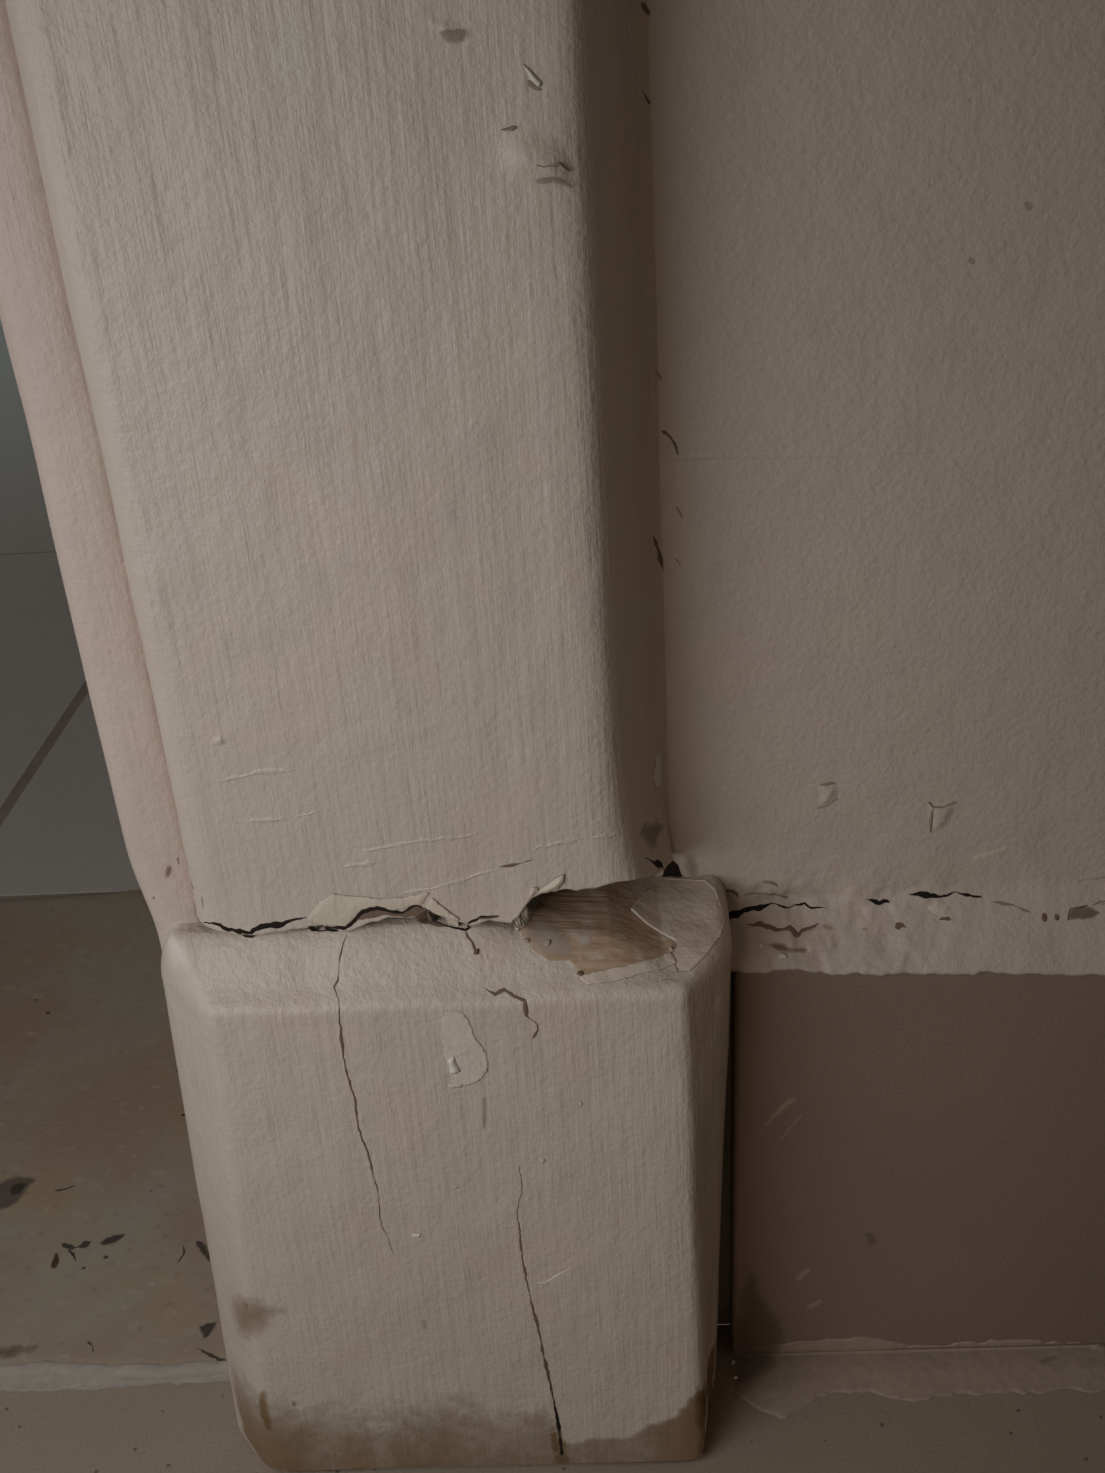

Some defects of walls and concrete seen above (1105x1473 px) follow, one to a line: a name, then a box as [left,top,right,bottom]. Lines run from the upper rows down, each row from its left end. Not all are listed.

crack [499,859,533,867]
peeling [512,875,725,985]
crack [726,880,841,955]
crack [867,891,1030,930]
crack [485,988,539,1039]
crack [191,884,499,1250]
crack [516,1172,564,1456]